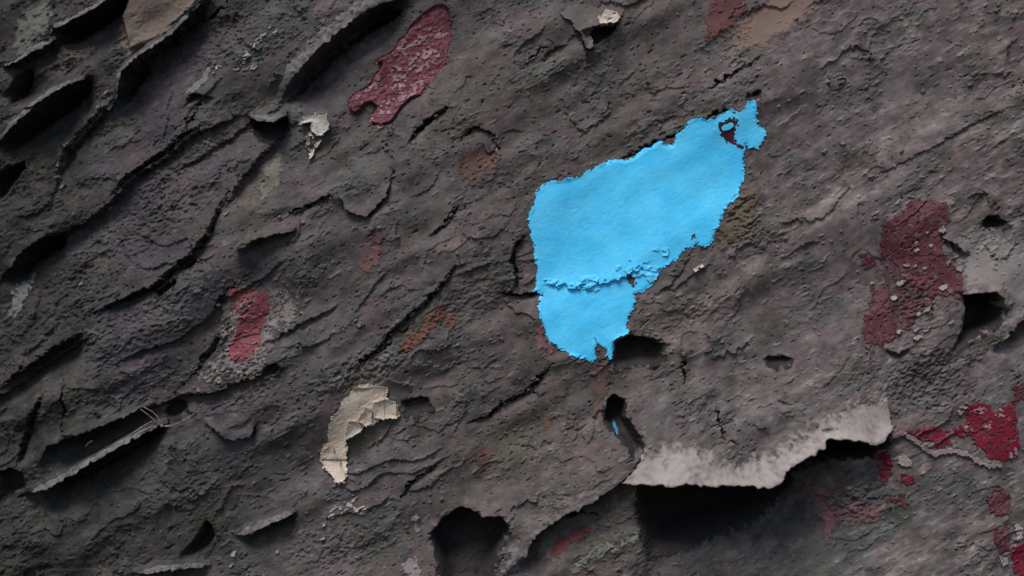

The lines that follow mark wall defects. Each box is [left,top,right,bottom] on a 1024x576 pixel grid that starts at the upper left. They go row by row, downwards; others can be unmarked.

peeling [248,0,413,160]
crack [115,103,202,190]
crack [95,191,230,314]
crack [5,334,81,383]
peeling [0,397,189,503]
crack [190,337,221,378]
crack [214,286,234,308]
peeling [320,384,435,485]
crack [470,363,555,423]
spalling [609,332,667,374]
peeling [428,380,893,576]
spalling [947,283,1024,357]